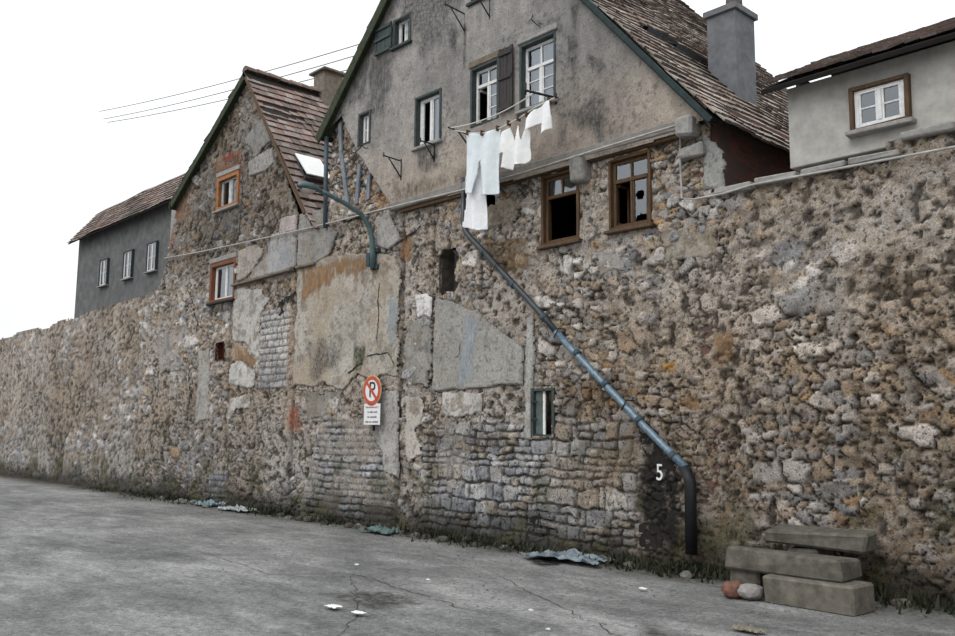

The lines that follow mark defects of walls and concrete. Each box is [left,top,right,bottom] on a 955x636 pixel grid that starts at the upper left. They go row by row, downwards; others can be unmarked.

flaking render [699,134,726,190]
flaking render [226,118,536,478]
leakage [640,429,684,542]